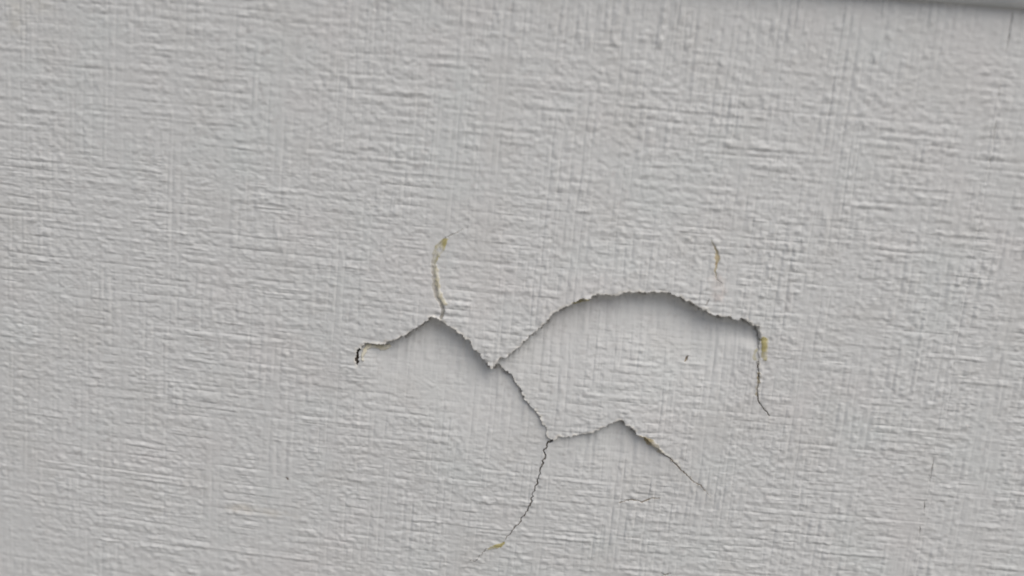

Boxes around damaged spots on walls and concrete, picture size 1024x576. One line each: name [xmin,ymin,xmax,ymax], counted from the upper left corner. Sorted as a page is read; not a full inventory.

crack [431,227,468,320]
peeling [353,289,771,501]
crack [470,440,553,562]